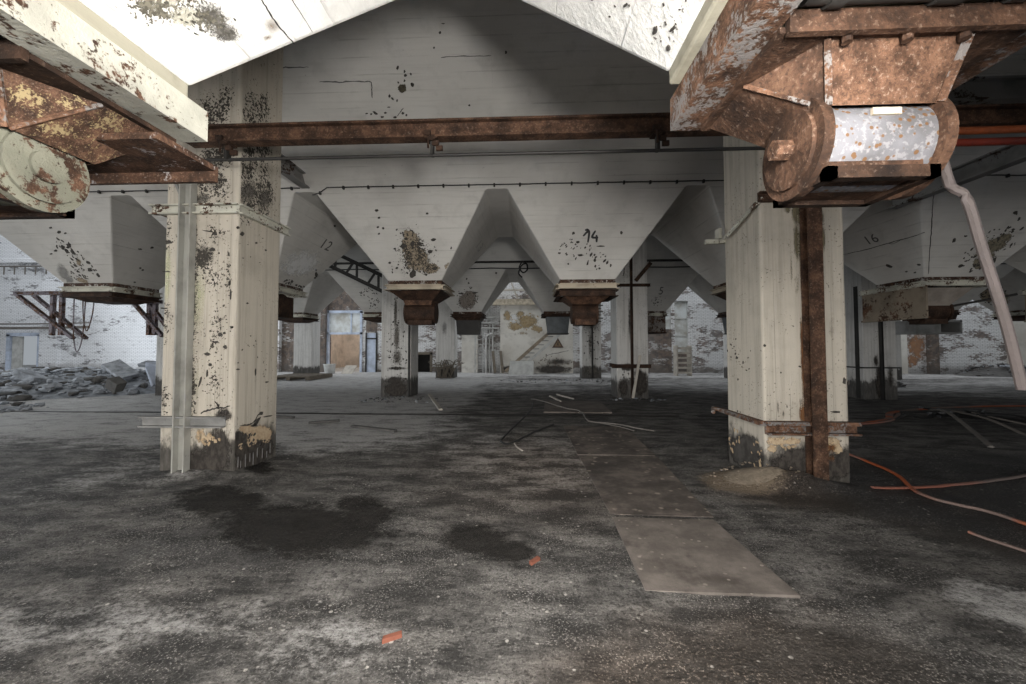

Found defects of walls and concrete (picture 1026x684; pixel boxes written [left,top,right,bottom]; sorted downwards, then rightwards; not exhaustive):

leakage [115,0,238,41]
crack [261,0,312,44]
leakage [198,80,275,124]
leakage [197,147,280,226]
spalling [190,409,274,470]
spalling [728,428,806,473]
spalling [828,437,850,480]